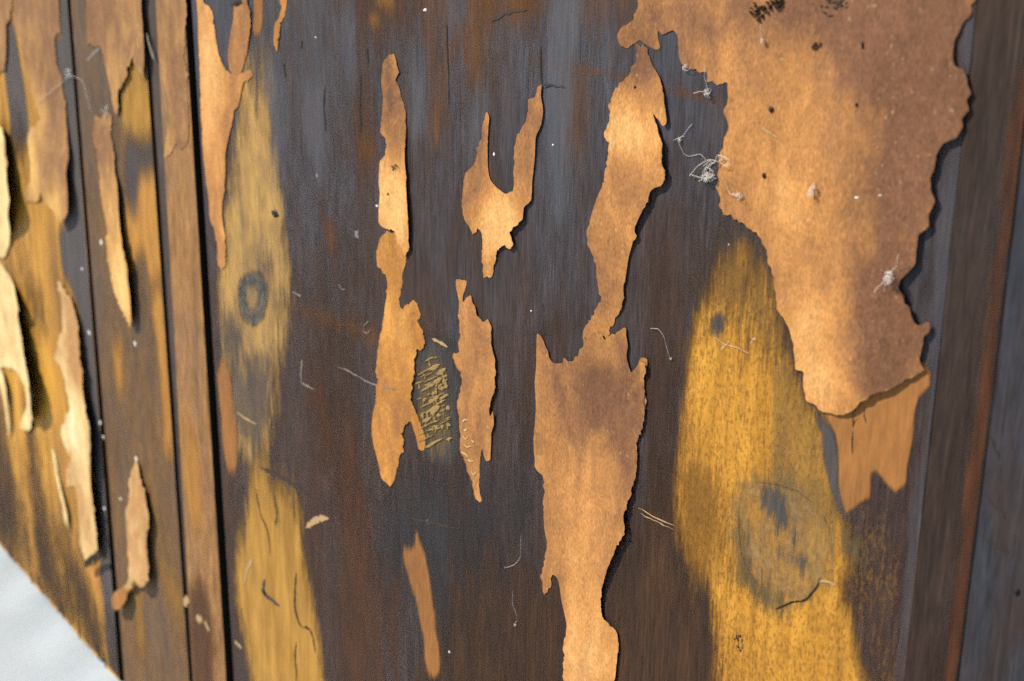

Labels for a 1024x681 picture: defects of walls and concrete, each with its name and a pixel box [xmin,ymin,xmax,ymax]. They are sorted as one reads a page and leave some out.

peeling [120,58,151,145]
damp [711,316,723,334]
damp [224,312,270,467]
peeling [639,361,647,406]
damp [818,416,845,516]